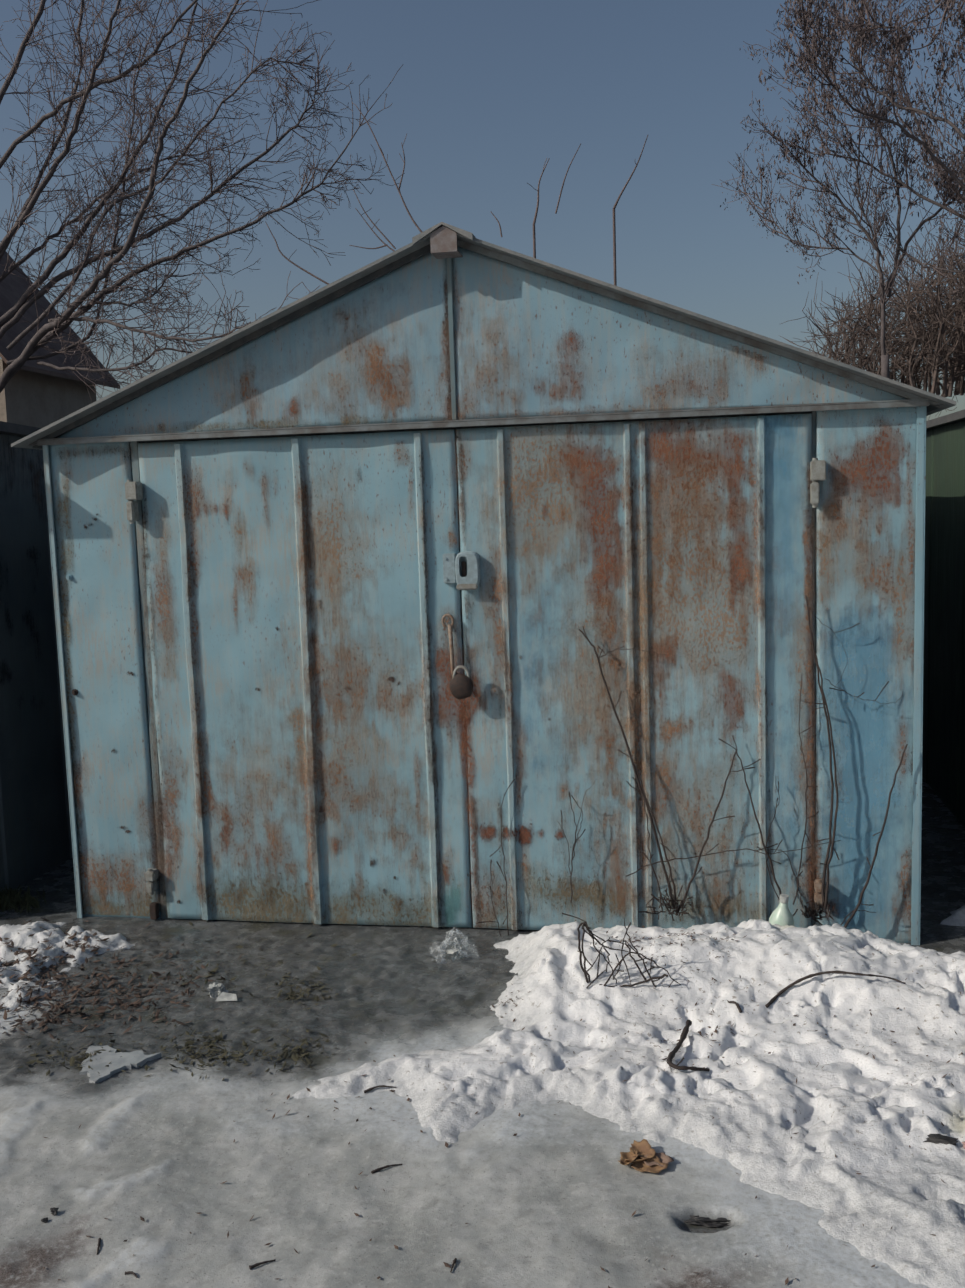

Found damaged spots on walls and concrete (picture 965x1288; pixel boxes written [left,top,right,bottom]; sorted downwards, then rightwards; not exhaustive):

corrosion [79,467,420,907]
corrosion [324,335,415,416]
corrosion [435,280,772,927]
corrosion [795,422,915,912]